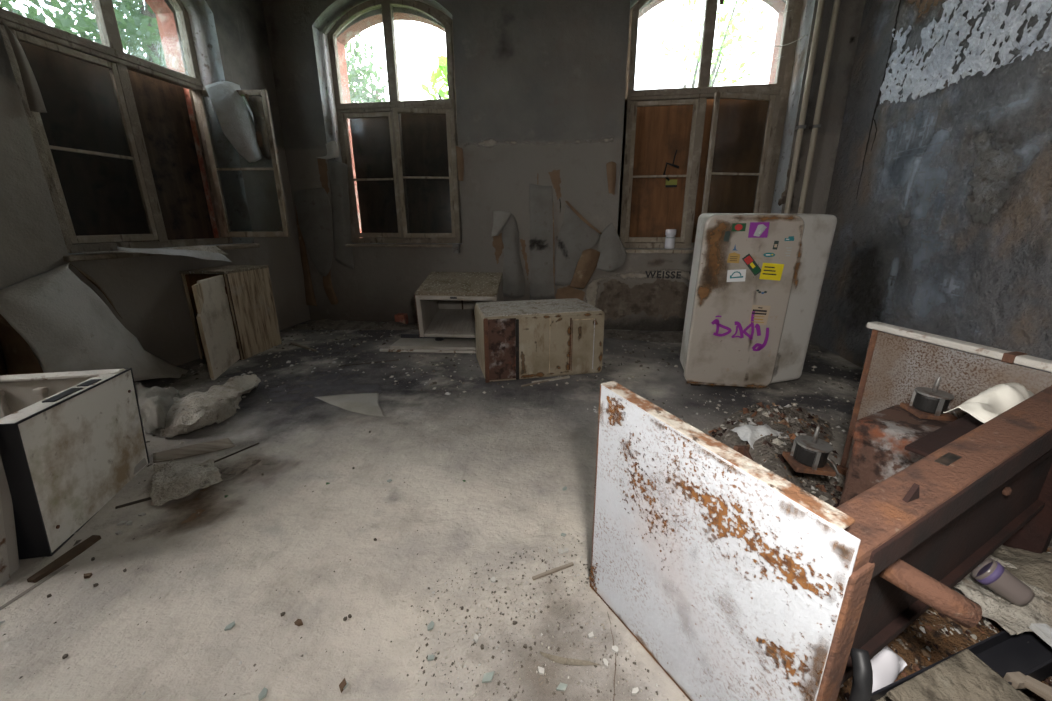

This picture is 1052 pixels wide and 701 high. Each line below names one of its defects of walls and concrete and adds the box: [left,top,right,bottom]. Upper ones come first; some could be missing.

peeling [880,0,1052,104]